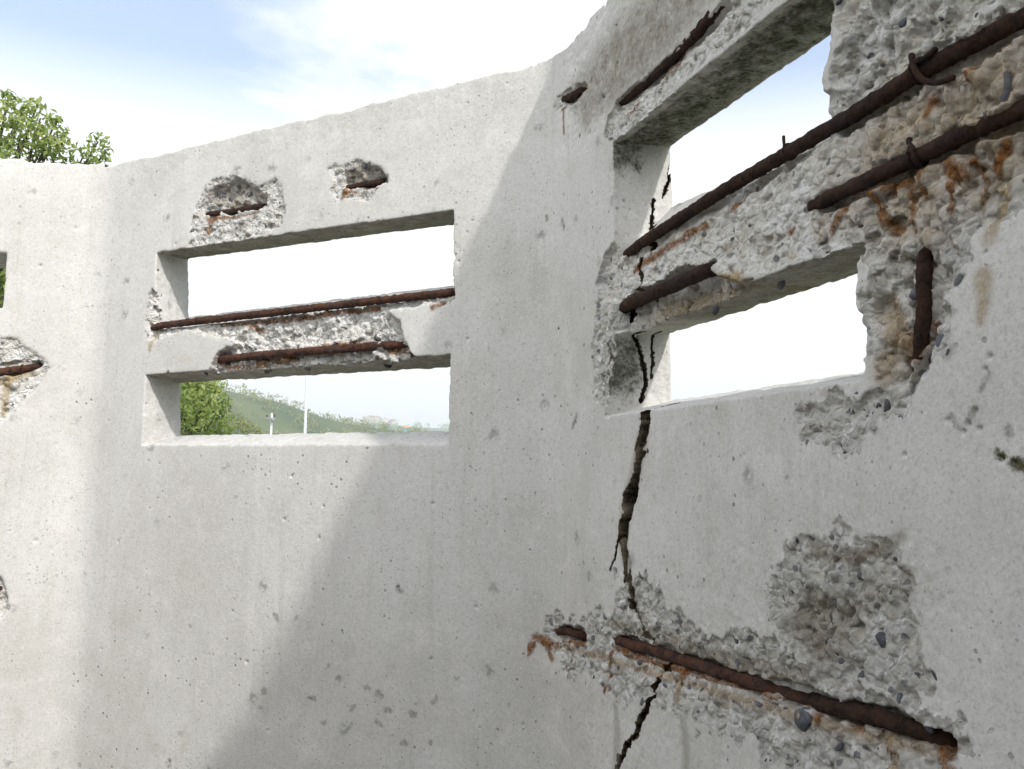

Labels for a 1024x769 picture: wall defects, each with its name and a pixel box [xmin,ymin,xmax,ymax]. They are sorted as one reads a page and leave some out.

spalling [187,173,286,248]
spalling [327,158,389,202]
corrosion [633,222,709,275]
spalling [590,0,1024,460]
corrosion [866,170,929,236]
corrosion [943,138,1013,211]
spalling [145,279,455,376]
corrosion [220,307,381,333]
spalling [0,336,50,422]
crack [609,164,677,769]
corrosion [527,633,587,678]
spalling [543,514,976,769]